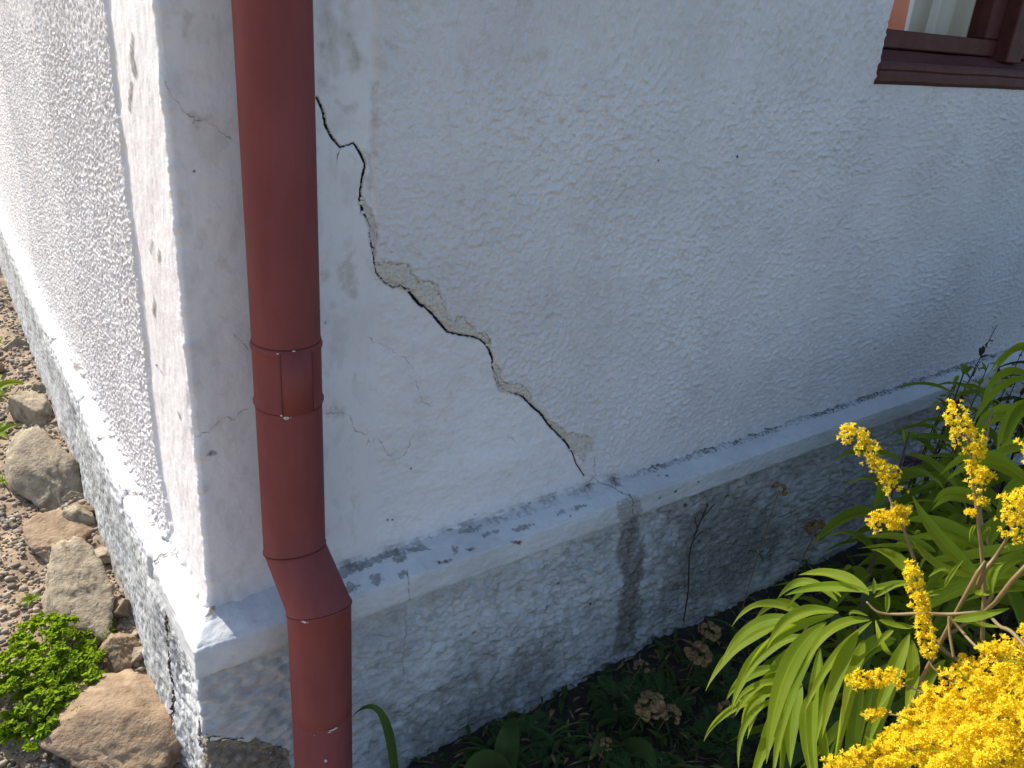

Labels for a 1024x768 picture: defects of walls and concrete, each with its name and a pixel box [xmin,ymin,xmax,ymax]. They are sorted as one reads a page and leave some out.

crack [316,97,637,520]
spalling [491,363,532,402]
spalling [547,419,594,460]